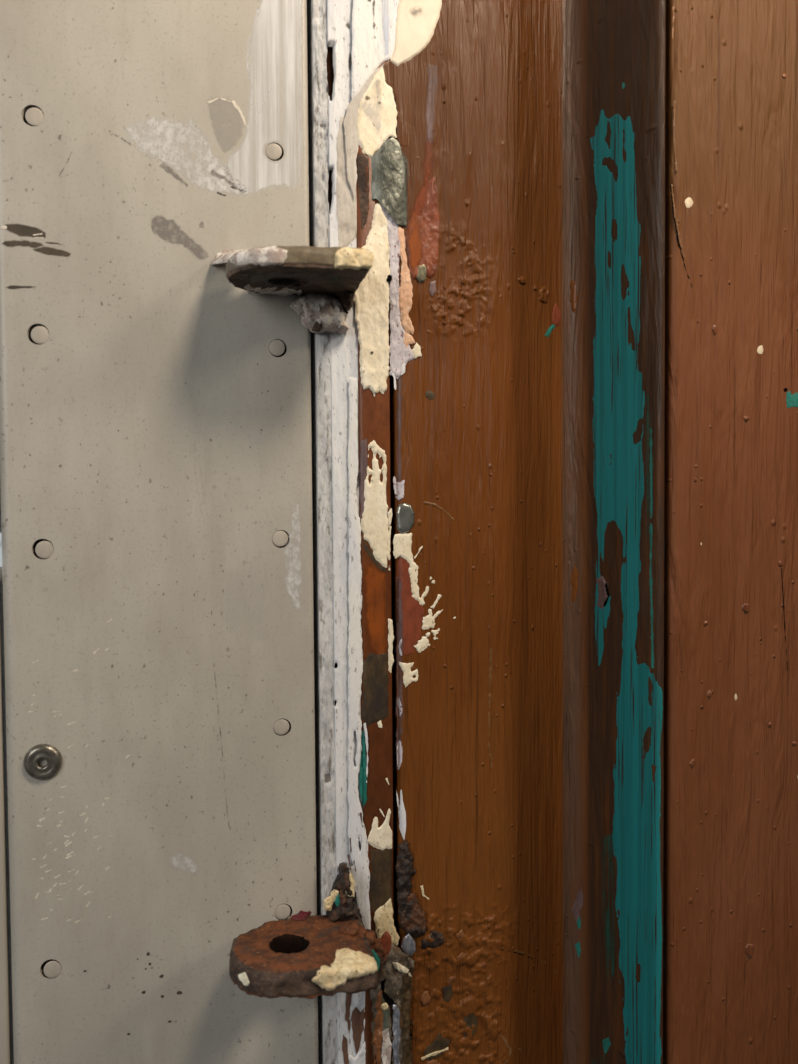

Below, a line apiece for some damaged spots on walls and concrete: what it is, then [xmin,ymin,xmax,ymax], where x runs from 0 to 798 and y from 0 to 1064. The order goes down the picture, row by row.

peeling [334,0,442,270]
peeling [391,333,422,390]
peeling [396,556,424,655]
peeling [362,653,389,725]
peeling [323,872,355,911]
peeling [370,848,392,912]
peeling [401,933,416,956]
peeling [312,948,396,1064]